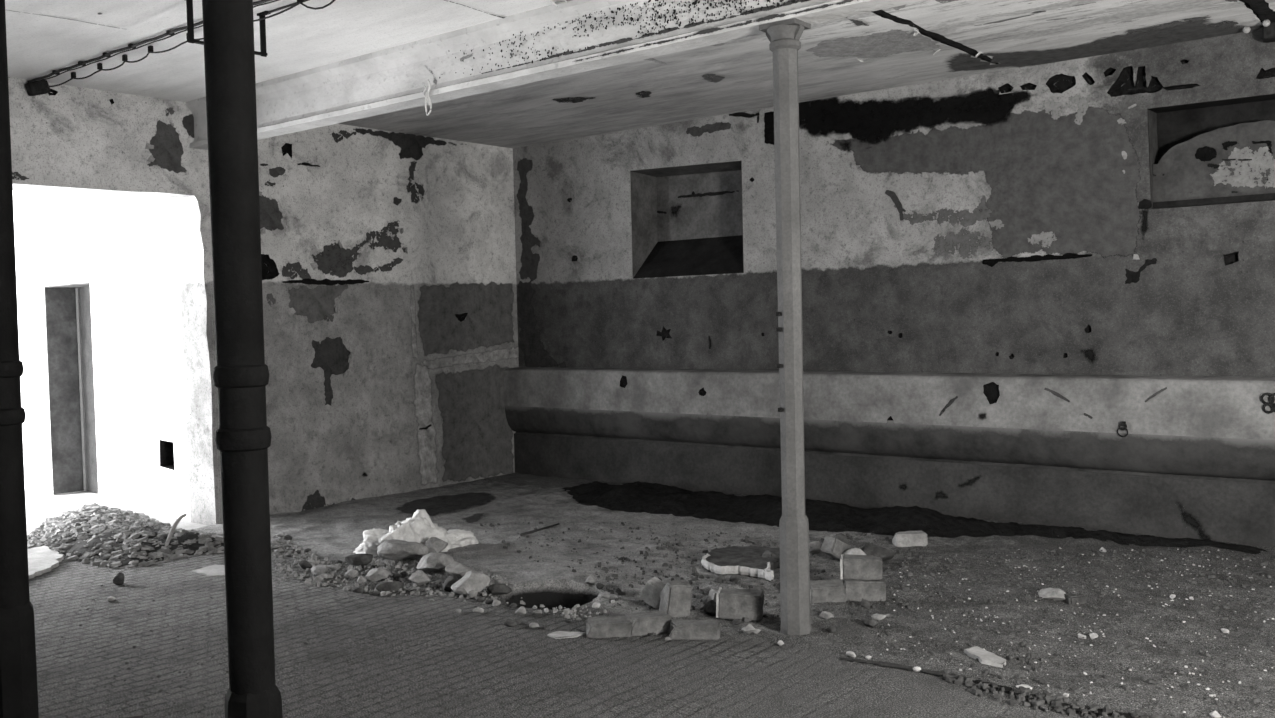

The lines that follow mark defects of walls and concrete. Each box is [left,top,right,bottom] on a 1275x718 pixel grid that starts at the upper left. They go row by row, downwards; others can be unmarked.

peeling [145,107,194,173]
peeling [828,66,1201,260]
peeling [261,220,408,323]
peeling [311,337,354,412]